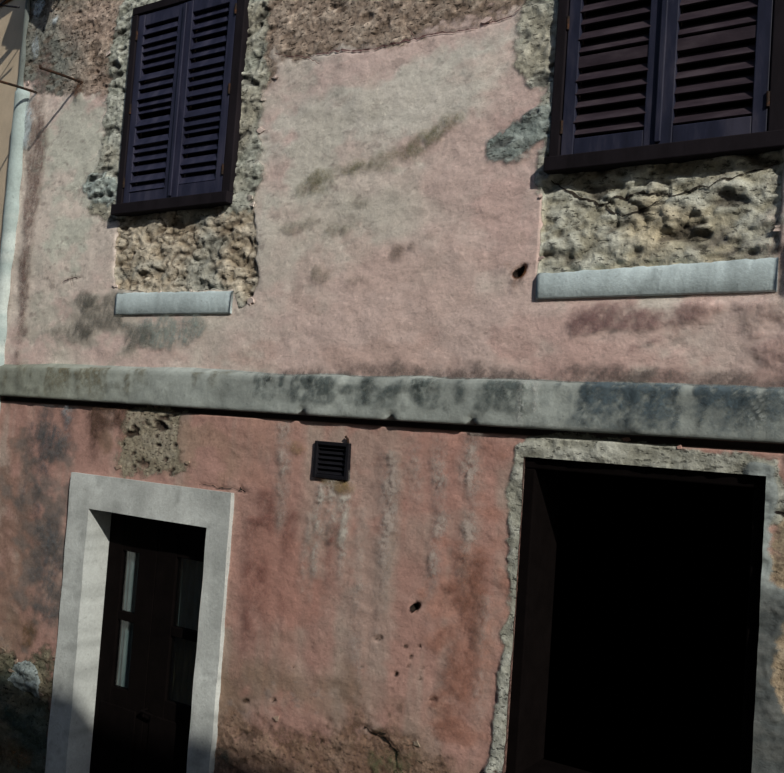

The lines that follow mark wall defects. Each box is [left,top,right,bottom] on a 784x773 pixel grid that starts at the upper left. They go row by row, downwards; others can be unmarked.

water stain [24,97,46,233]
flaking render [537,150,784,275]
crack [551,163,778,217]
water stain [20,244,29,316]
flaking render [113,195,259,308]
water stain [256,359,541,418]
water stain [566,363,784,425]
flaking render [115,405,190,478]
water stain [318,479,351,556]
flaking render [770,623,784,714]
flaking render [0,644,56,773]
crack [364,726,399,773]